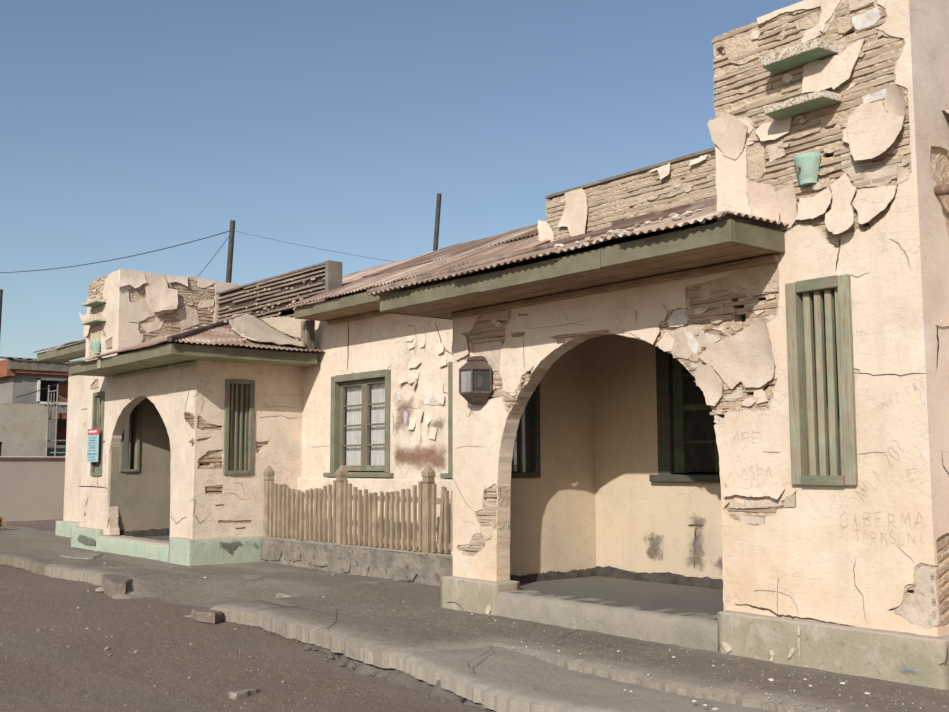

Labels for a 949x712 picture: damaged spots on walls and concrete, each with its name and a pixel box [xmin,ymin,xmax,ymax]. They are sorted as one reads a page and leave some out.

flaking render [708,0,912,248]
peeling [649,163,670,180]
peeling [537,188,588,245]
flaking render [79,273,216,357]
flaking render [551,262,780,424]
flaking render [183,412,223,469]
flaking render [723,477,796,526]
flaking render [451,484,511,577]
damp [647,536,661,558]
damp [691,518,703,568]
flaking render [891,534,949,630]